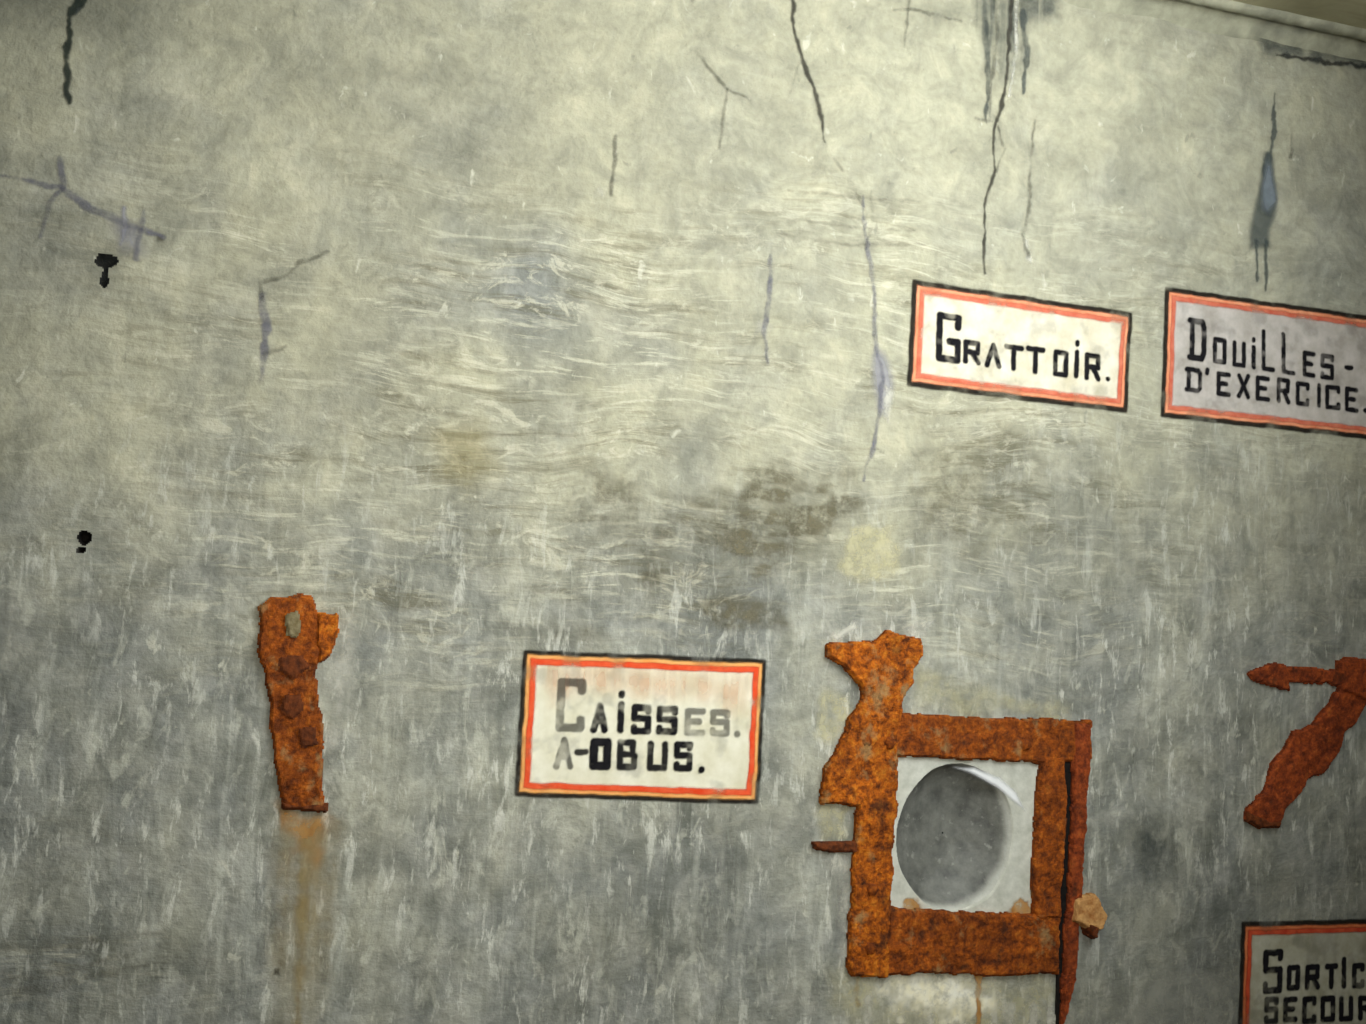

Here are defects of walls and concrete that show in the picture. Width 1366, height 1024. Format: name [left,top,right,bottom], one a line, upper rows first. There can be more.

crack [63,0,87,104]
crack [791,0,824,130]
water stain [983,0,1052,97]
crack [28,164,163,255]
crack [983,0,1013,274]
water stain [1251,100,1277,290]
crack [864,292,892,479]
rust [1008,898,1031,914]